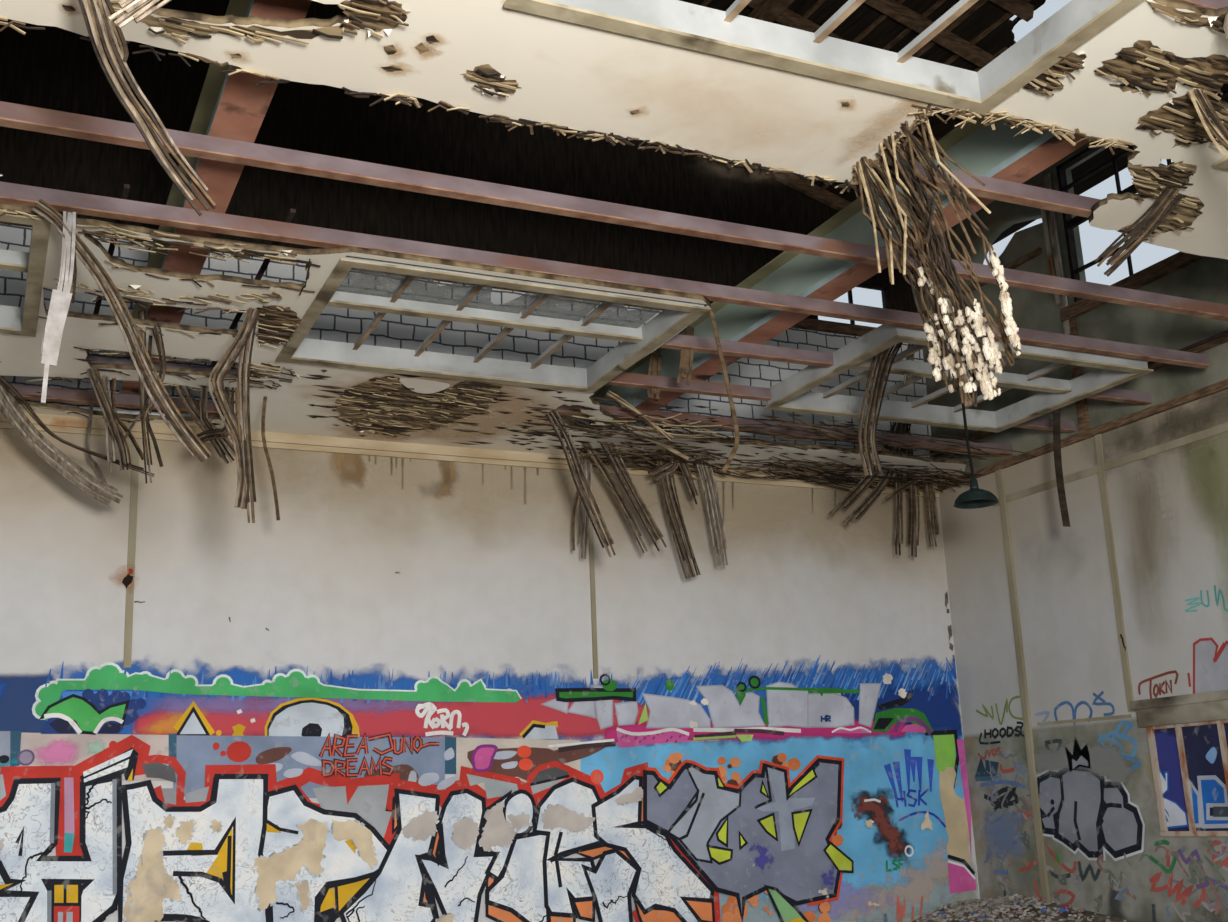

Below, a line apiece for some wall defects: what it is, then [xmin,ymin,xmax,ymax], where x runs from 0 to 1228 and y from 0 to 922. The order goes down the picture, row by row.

spalling [0,17,45,35]
flaking render [80,0,410,86]
flaking render [415,35,440,56]
flaking render [342,40,1228,241]
flaking render [43,224,321,349]
flaking render [10,347,933,474]
damp [334,453,405,482]
damp [568,473,933,543]
corrosion [119,569,133,589]
peeling [123,814,222,922]
peeling [254,818,378,912]
peeling [402,802,595,852]